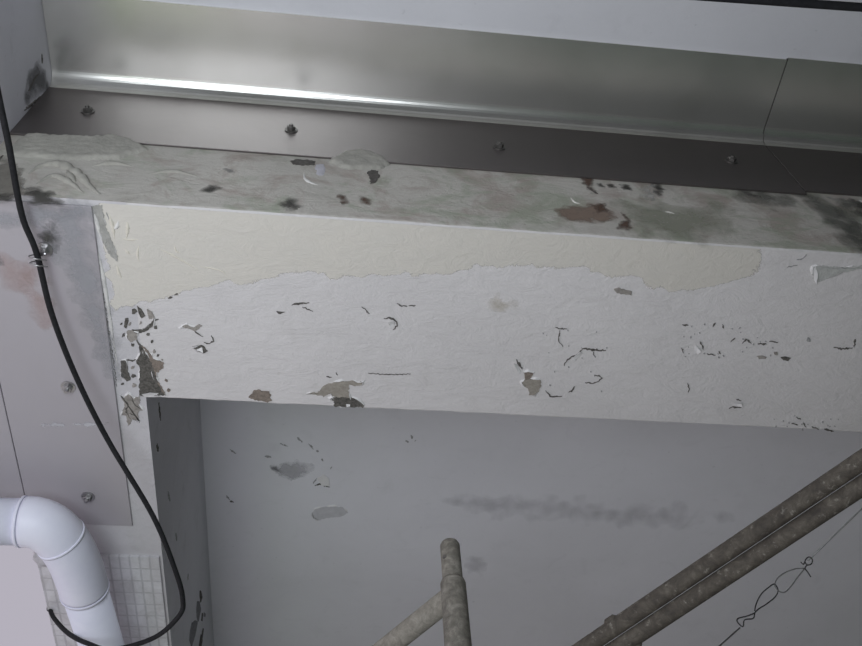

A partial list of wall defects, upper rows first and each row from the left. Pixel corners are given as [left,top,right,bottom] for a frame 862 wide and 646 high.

spalling [290,159,325,185]
spalling [367,170,380,184]
spalling [92,205,119,262]
corrosion [556,178,630,230]
leakage [800,195,862,251]
peeling [178,323,214,353]
peeling [681,323,791,361]
peeling [120,306,170,426]
spalling [249,389,272,403]
spalling [306,373,365,408]
spalling [514,360,575,398]
spalling [189,590,206,646]